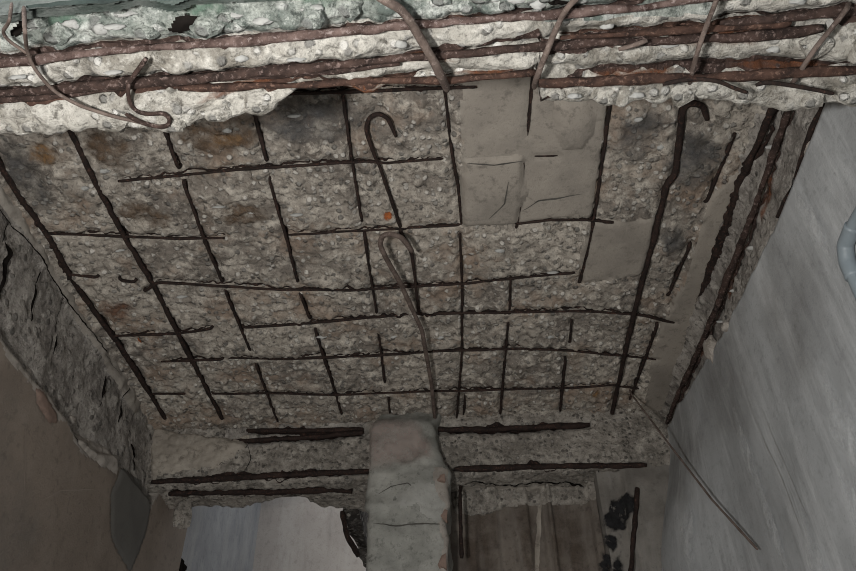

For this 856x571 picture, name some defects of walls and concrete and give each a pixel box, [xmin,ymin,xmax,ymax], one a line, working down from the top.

rust [181,125,257,153]
spalling [0,0,856,87]
crack [0,210,136,470]
spalling [0,61,856,509]